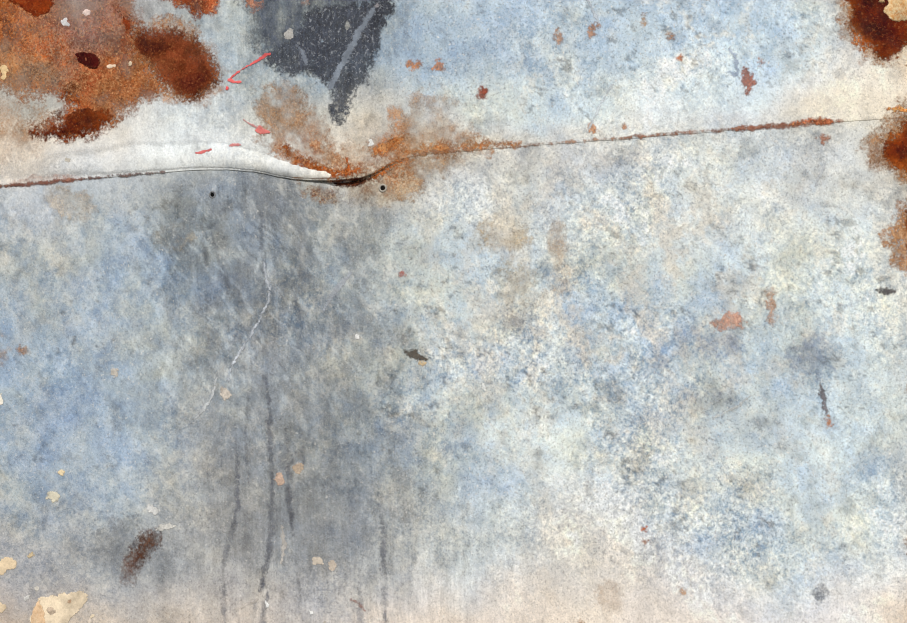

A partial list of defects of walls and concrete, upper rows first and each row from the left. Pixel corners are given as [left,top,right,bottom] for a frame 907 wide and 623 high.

corrosion [0,0,223,143]
corrosion [836,0,907,65]
corrosion [256,87,522,204]
corrosion [863,101,907,183]
corrosion [878,201,907,271]
peeling [24,586,88,623]